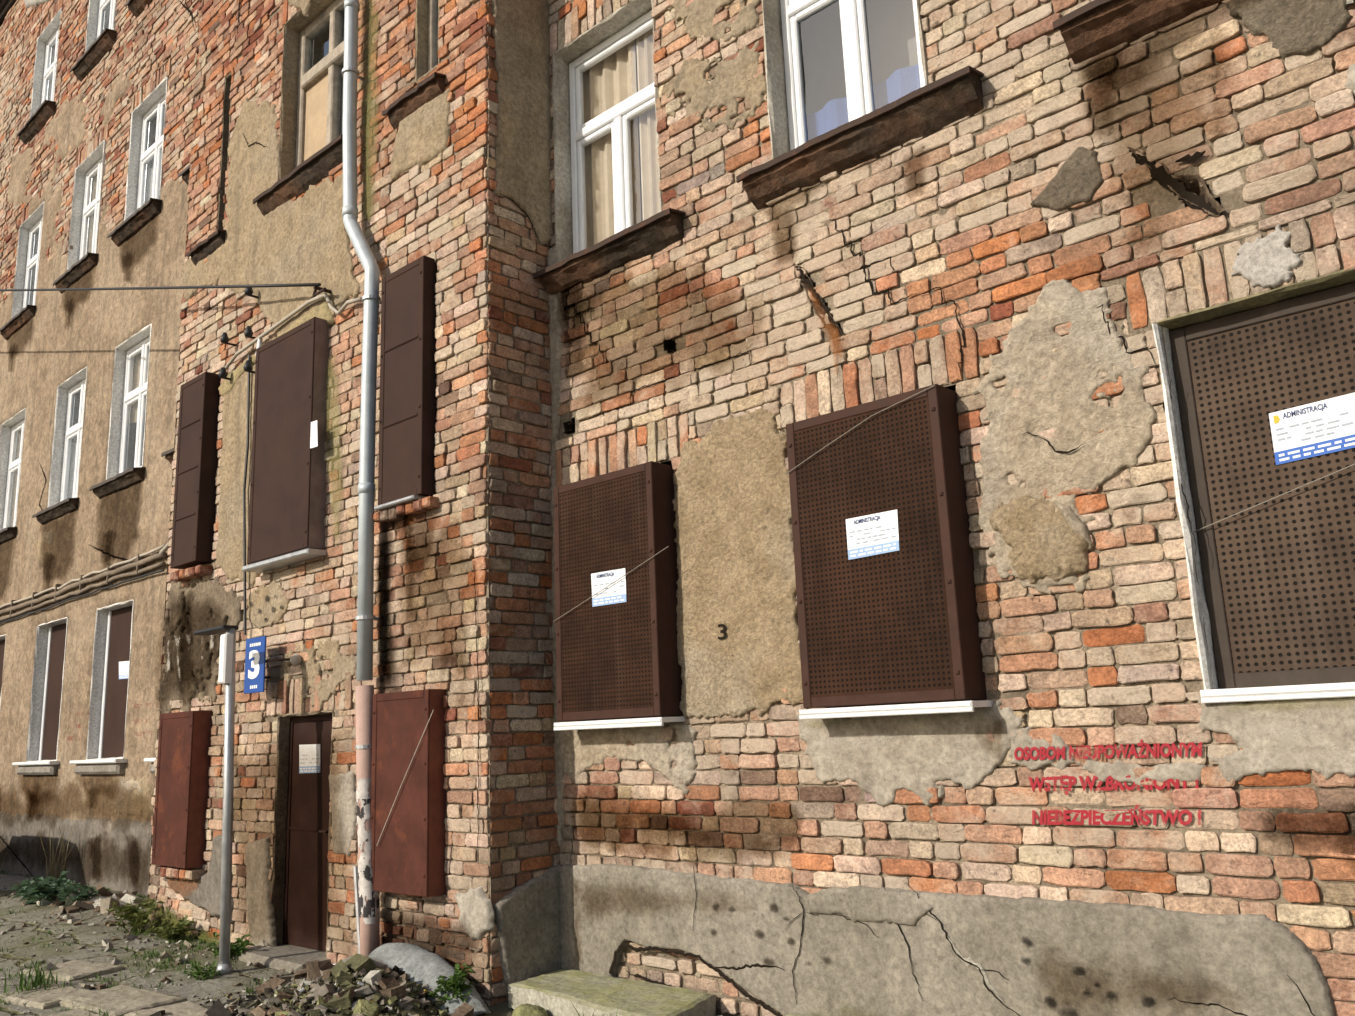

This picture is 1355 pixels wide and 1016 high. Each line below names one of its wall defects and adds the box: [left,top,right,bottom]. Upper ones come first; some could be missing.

spalling [609,941,785,1016]
crack [785,885,1020,1016]